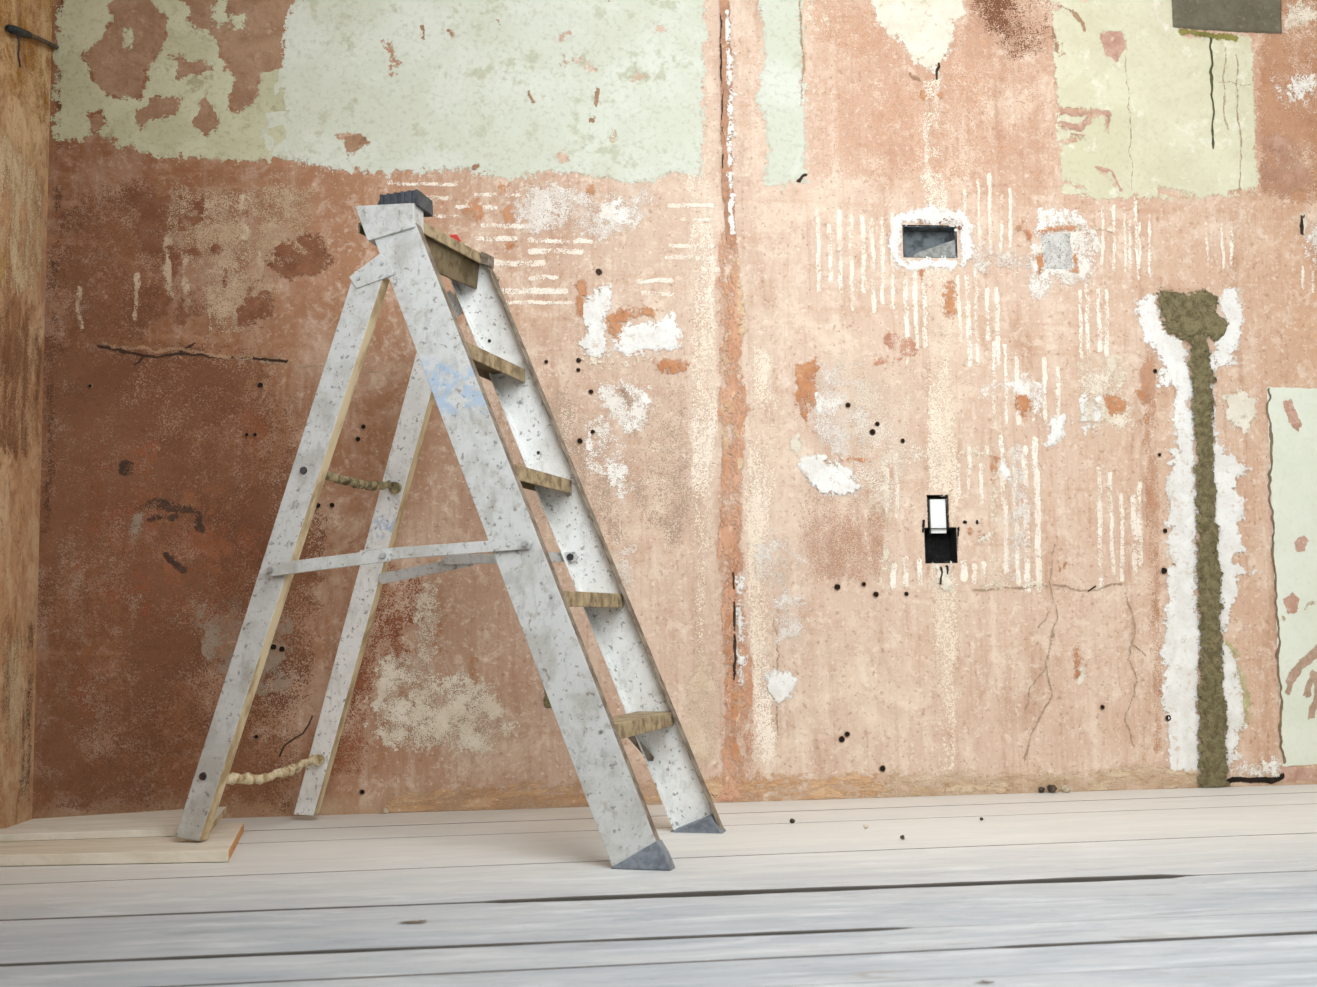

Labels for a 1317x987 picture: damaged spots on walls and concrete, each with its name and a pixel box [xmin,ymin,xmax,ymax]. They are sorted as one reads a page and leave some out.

peeling [50,0,709,196]
crack [40,0,65,533]
crack [97,341,322,368]
peeling [574,268,602,317]
crack [973,544,1146,761]
peeling [1266,387,1317,782]